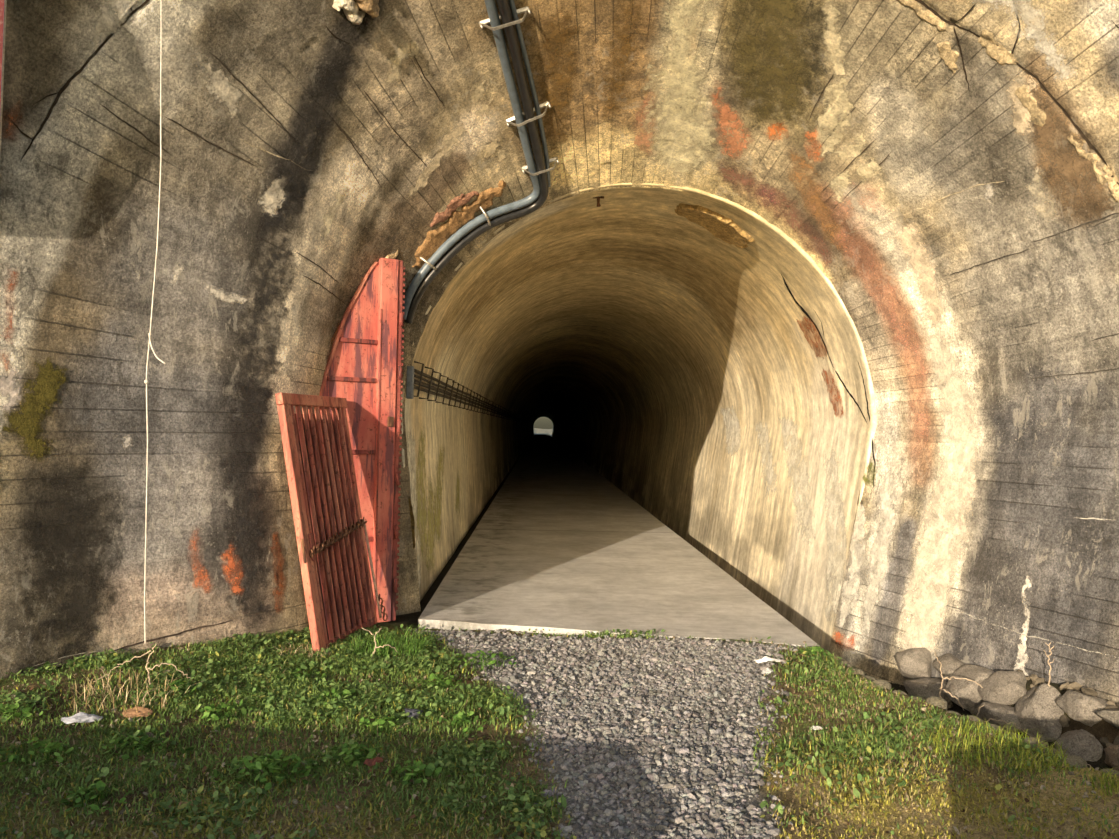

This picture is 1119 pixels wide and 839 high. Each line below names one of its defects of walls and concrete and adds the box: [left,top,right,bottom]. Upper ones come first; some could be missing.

crack [8,0,150,163]
crack [211,53,300,149]
spalling [332,0,379,25]
water stain [532,6,579,155]
water stain [602,0,715,172]
water stain [730,0,829,125]
crack [915,0,1119,185]
water stain [220,11,373,624]
corrosion [713,87,855,265]
corrosion [796,316,843,415]
crack [948,213,1119,276]
corrosion [224,549,242,593]